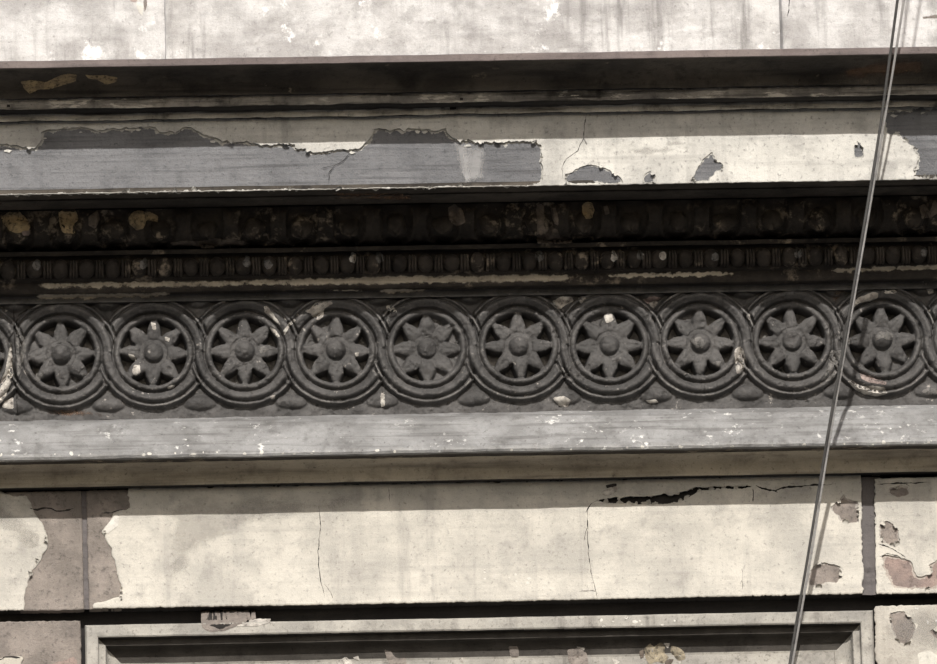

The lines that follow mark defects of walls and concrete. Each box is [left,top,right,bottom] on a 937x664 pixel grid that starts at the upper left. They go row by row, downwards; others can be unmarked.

peeling [21,74,117,94]
peeling [884,107,937,179]
peeling [0,127,543,196]
peeling [564,165,622,184]
peeling [691,153,724,183]
peeling [831,495,860,524]
crack [584,503,597,595]
peeling [879,521,937,590]
peeling [0,490,130,664]
peeling [808,563,842,587]
peeling [889,611,915,645]
spalling [639,643,686,664]